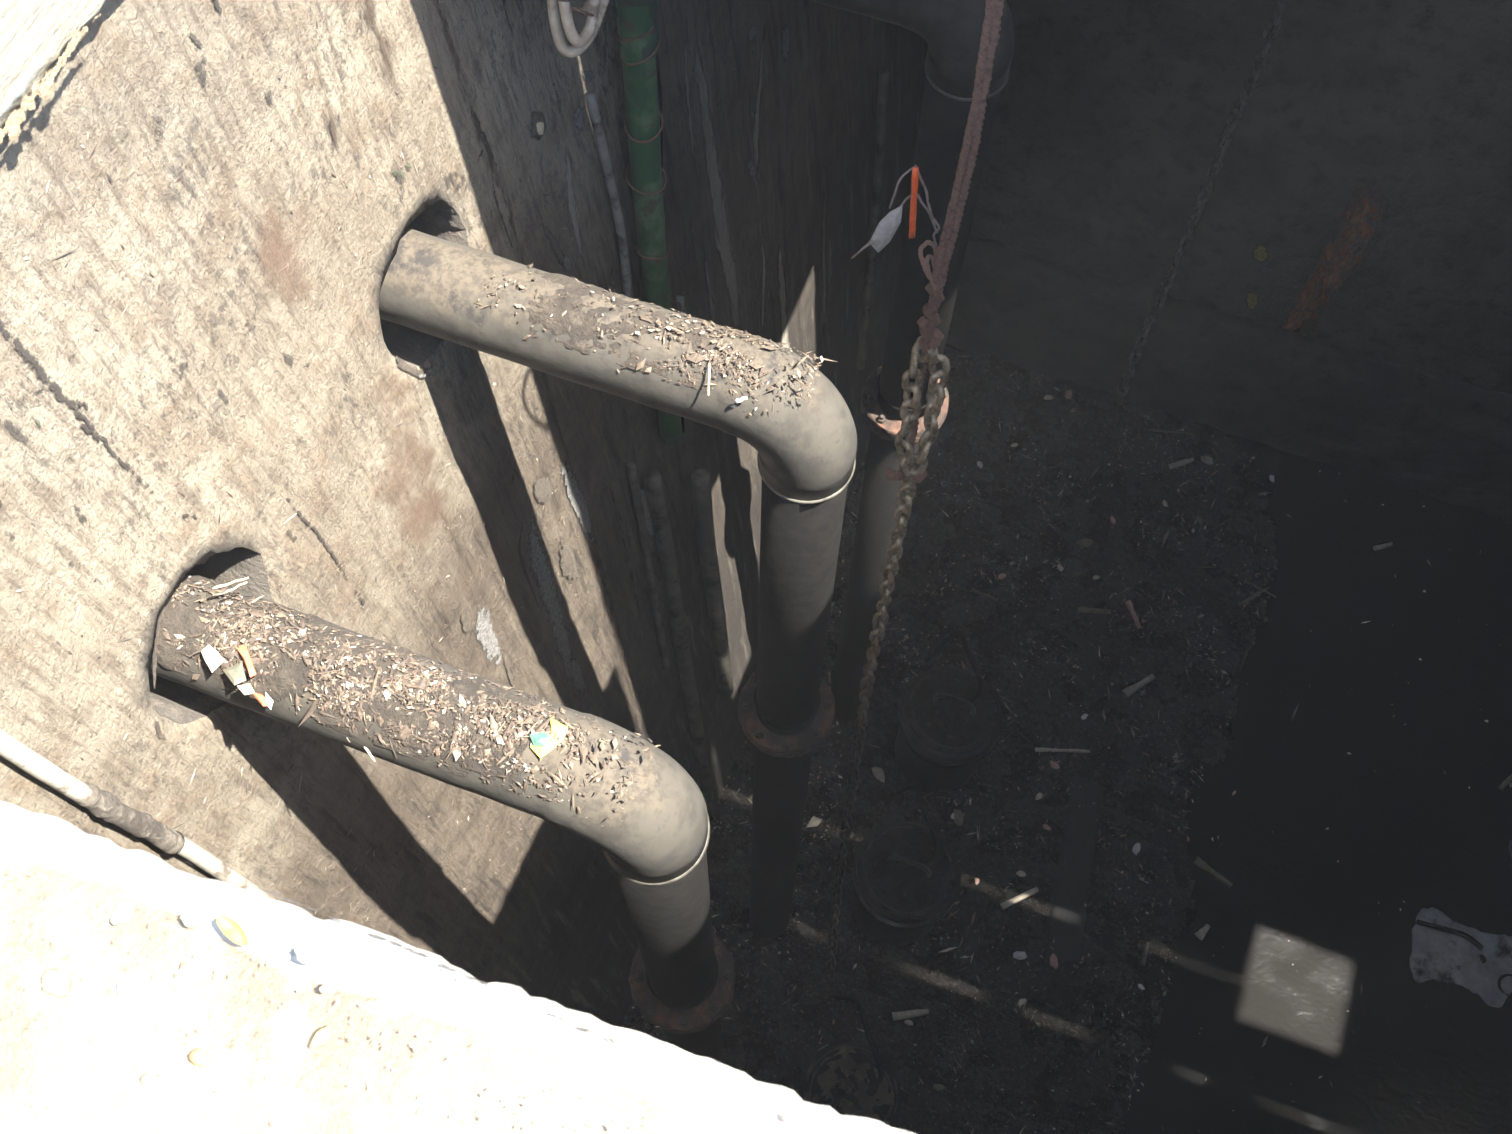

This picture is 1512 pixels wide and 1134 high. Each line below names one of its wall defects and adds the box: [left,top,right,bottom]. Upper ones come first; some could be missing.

crack [0,319,197,519]